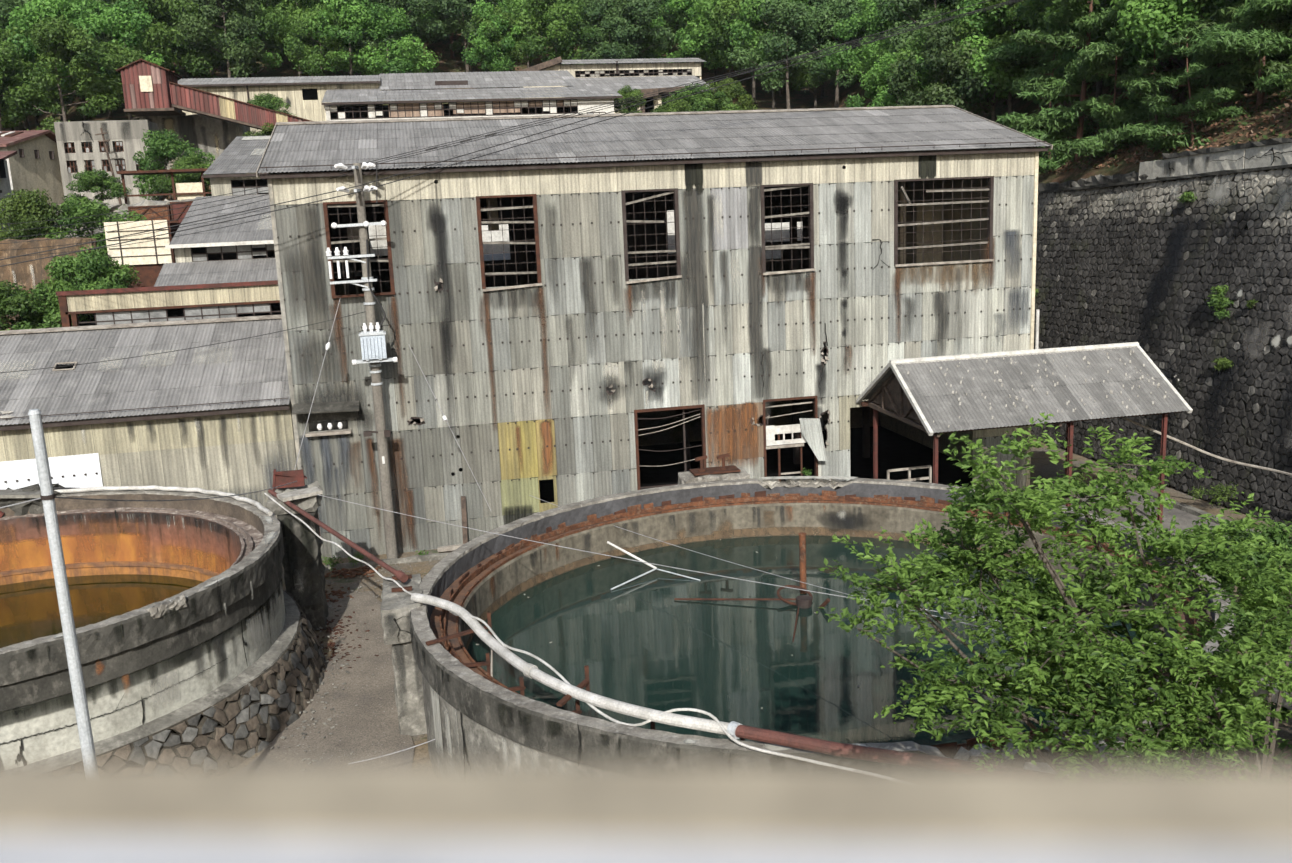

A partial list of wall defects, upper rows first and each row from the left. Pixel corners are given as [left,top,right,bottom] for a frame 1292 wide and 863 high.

water stain [1164,157,1209,193]
water stain [434,217,451,392]
water stain [632,165,728,383]
water stain [748,187,809,394]
water stain [838,198,848,275]
water stain [1005,230,1018,264]
water stain [1010,292,1028,320]
rust [707,402,758,464]
rust [0,534,147,572]